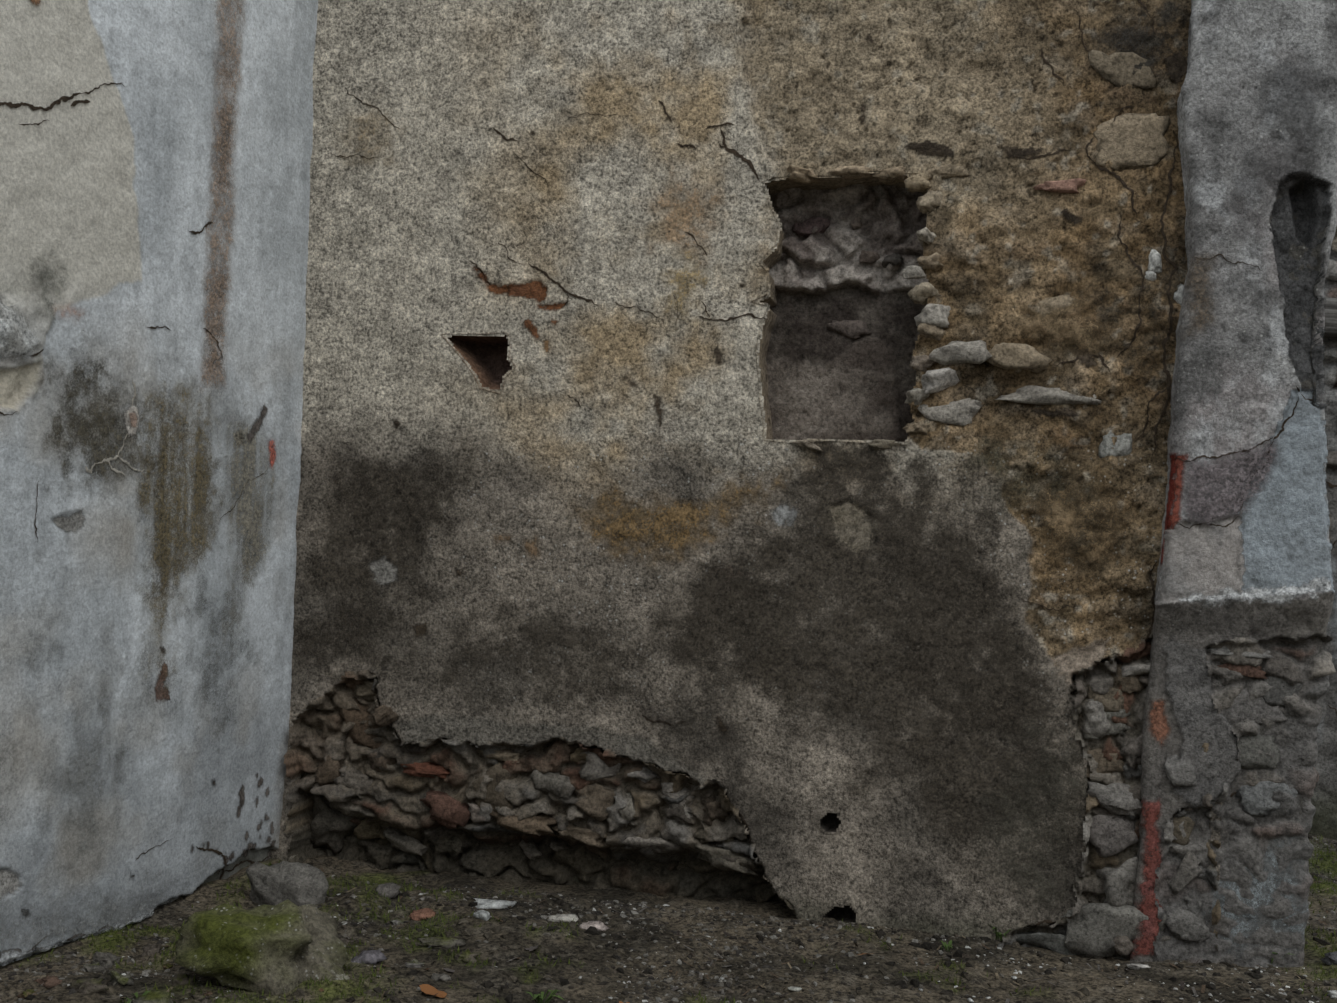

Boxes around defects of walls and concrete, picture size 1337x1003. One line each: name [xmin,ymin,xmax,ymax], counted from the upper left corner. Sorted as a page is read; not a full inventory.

crack [0,82,125,126]
damp [49,0,275,665]
spalling [473,267,565,352]
flaking render [786,164,1102,449]
flaking render [1144,249,1162,281]
crack [1009,106,1316,529]
peeling [1155,172,1337,606]
spalling [191,670,796,915]